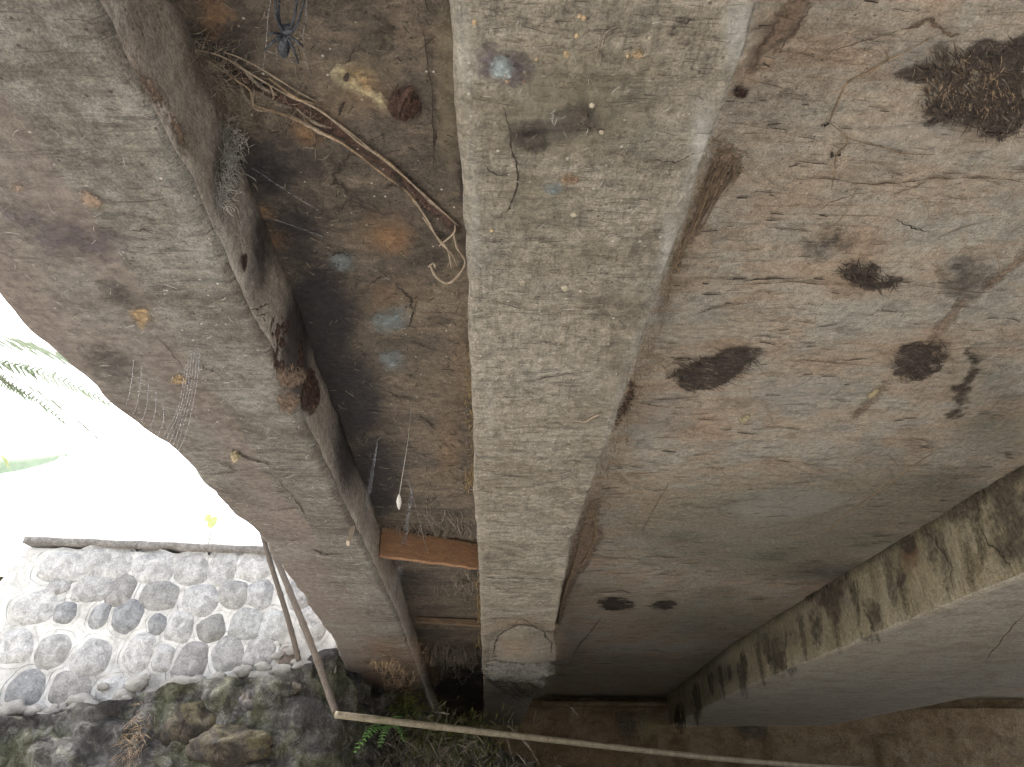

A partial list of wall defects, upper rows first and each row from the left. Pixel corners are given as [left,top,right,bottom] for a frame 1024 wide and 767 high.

crack [484,109,519,217]
water stain [946,350,980,420]
water stain [951,472,1024,582]
water stain [674,575,881,730]